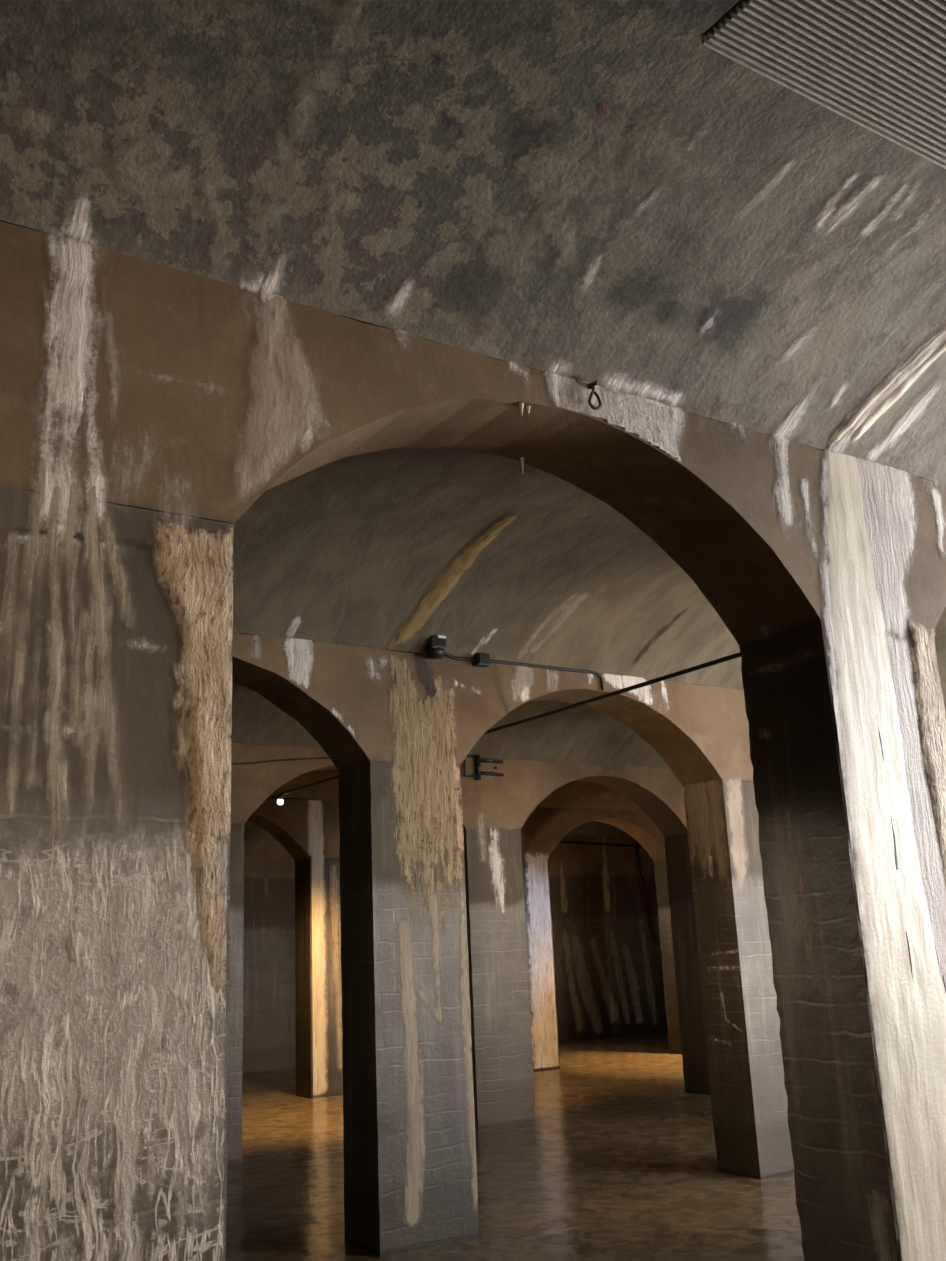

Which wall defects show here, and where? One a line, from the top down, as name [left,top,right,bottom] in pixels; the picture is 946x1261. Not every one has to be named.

leakage [814,175,881,234]
leakage [861,183,920,236]
leakage [386,282,412,314]
leakage [582,257,601,288]
leakage [782,328,814,361]
leakage [828,330,946,461]
leakage [7,197,129,825]
leakage [773,386,815,525]
leakage [931,480,945,552]
leakage [0,595,26,711]
spalling [155,523,233,988]
leakage [0,831,227,1261]